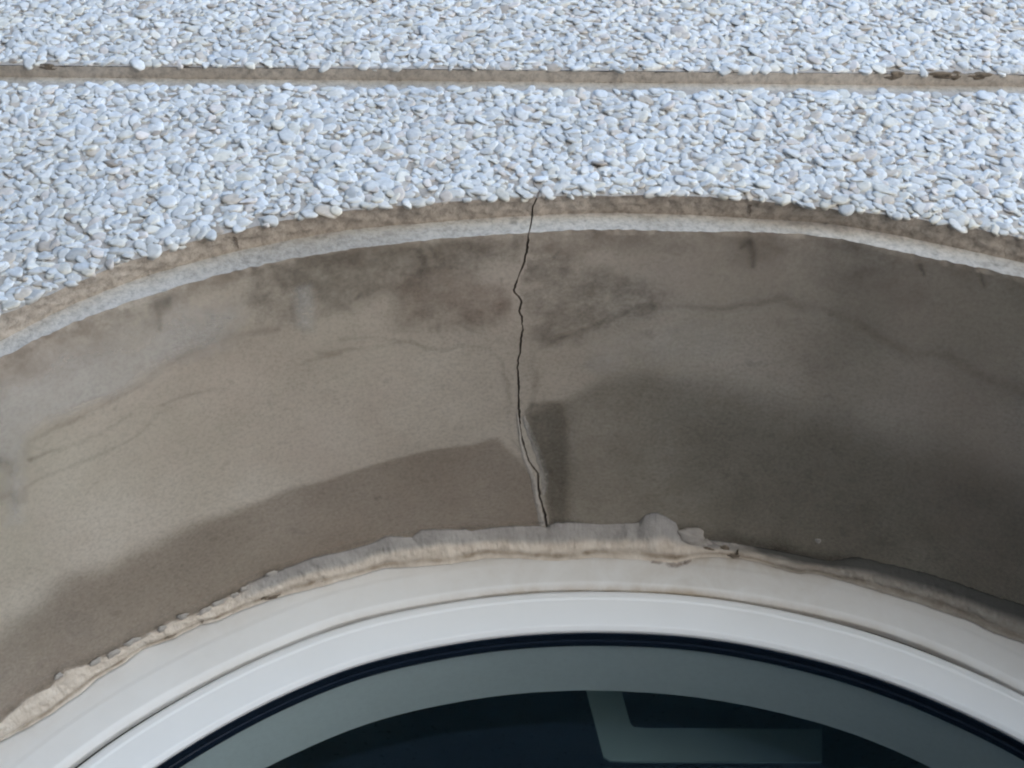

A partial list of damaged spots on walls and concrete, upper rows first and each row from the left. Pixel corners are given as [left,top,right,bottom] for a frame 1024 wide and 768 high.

crack [513,182,549,527]